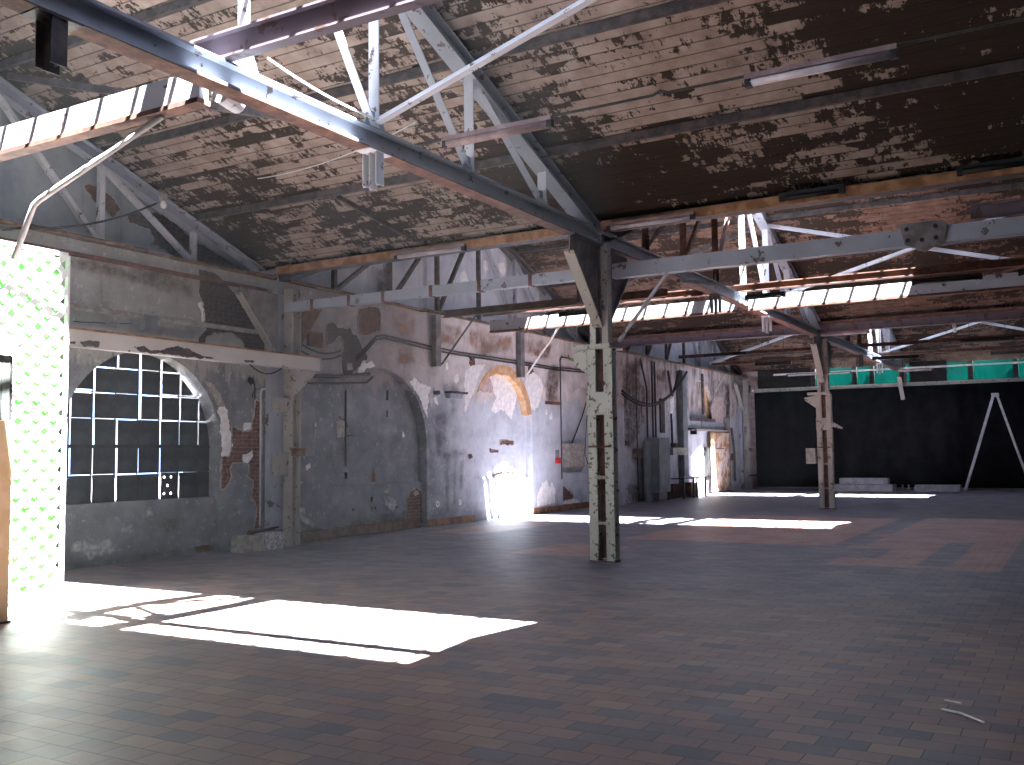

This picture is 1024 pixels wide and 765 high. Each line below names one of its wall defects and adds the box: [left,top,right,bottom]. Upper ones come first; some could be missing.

flaking render [82,183,266,363]
flaking render [326,305,381,379]
peeling [410,378,439,418]
peeling [445,355,552,420]
flaking render [205,381,263,529]
peeling [537,480,580,507]